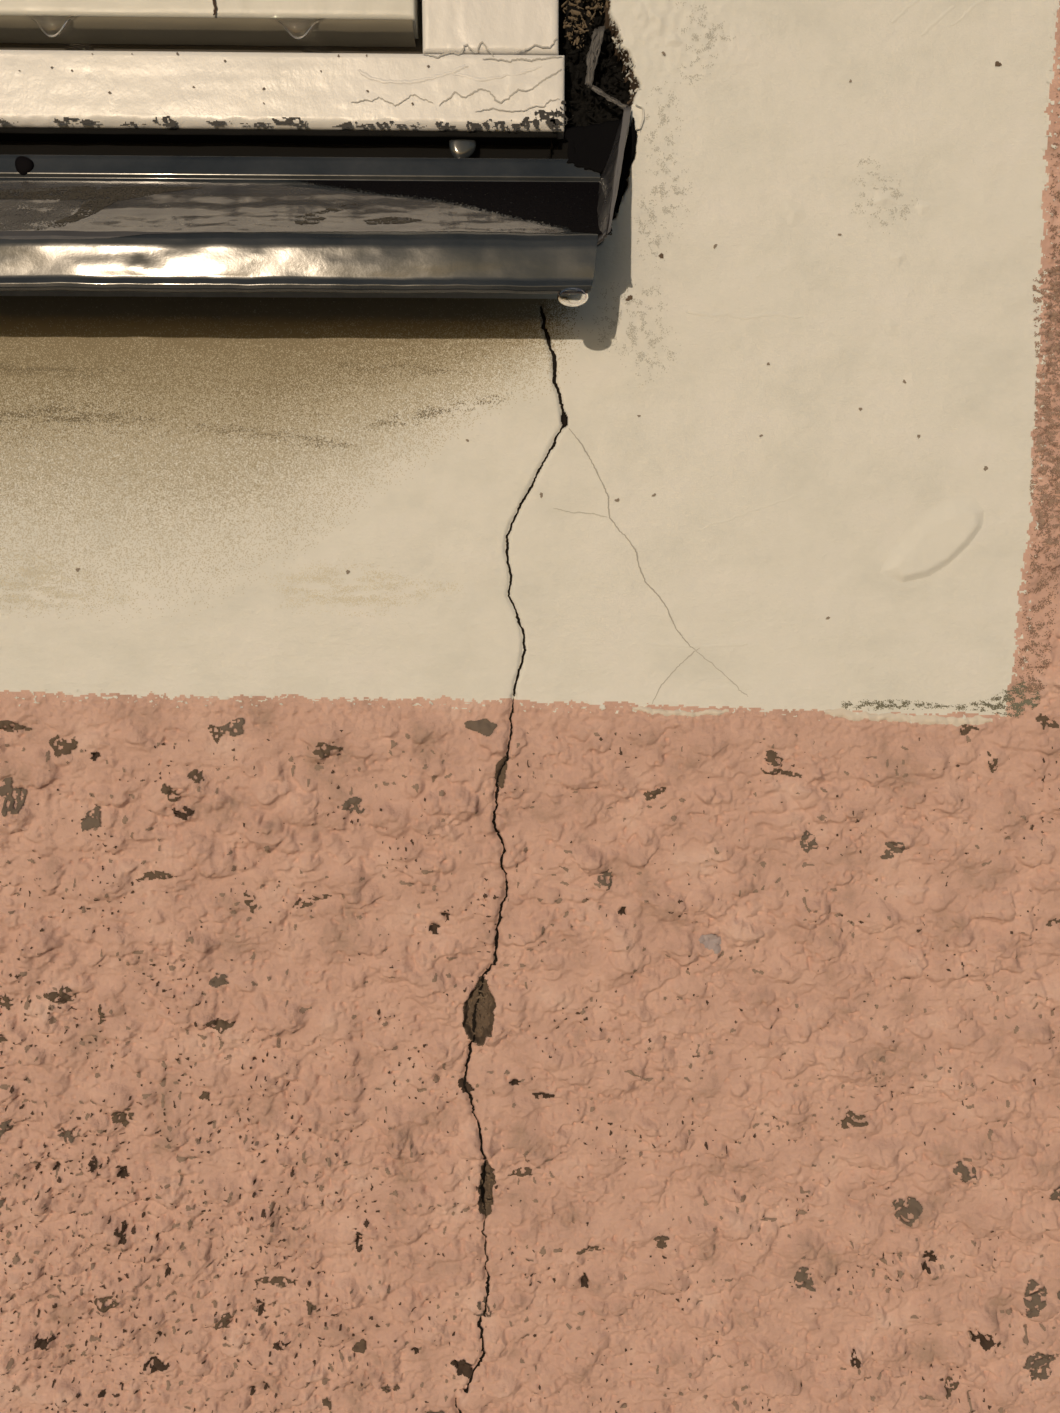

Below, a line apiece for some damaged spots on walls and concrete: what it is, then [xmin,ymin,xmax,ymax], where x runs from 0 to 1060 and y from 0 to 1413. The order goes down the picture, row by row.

crack [455,306,748,1413]